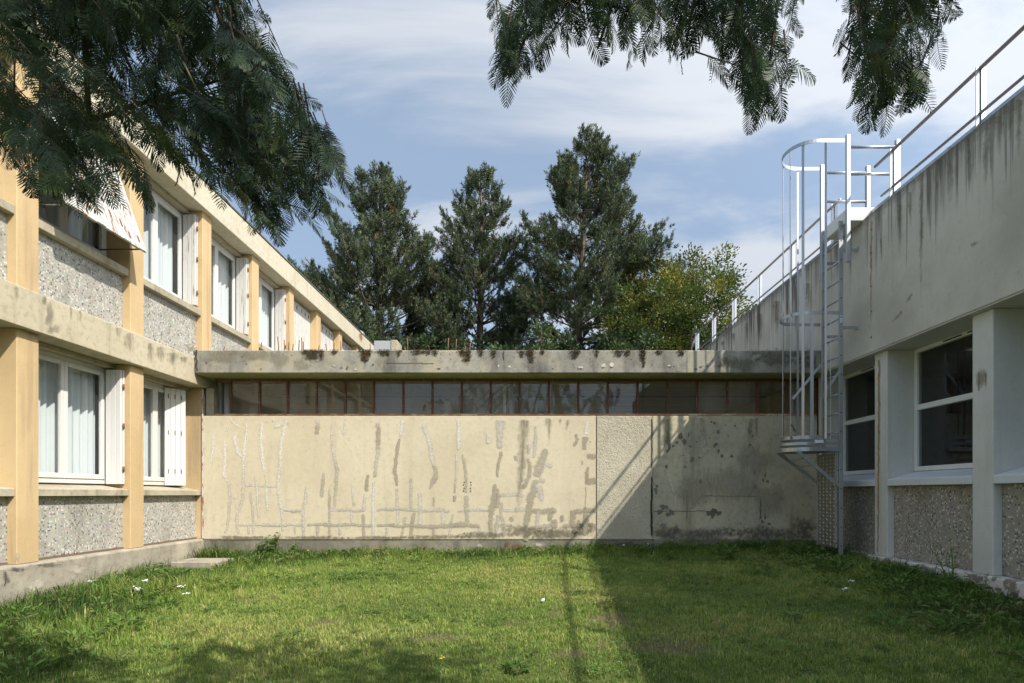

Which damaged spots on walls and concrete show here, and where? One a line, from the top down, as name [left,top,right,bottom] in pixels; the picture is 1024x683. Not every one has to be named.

peeling [661,421,754,469]
crack [650,419,762,536]
water stain [656,519,815,540]